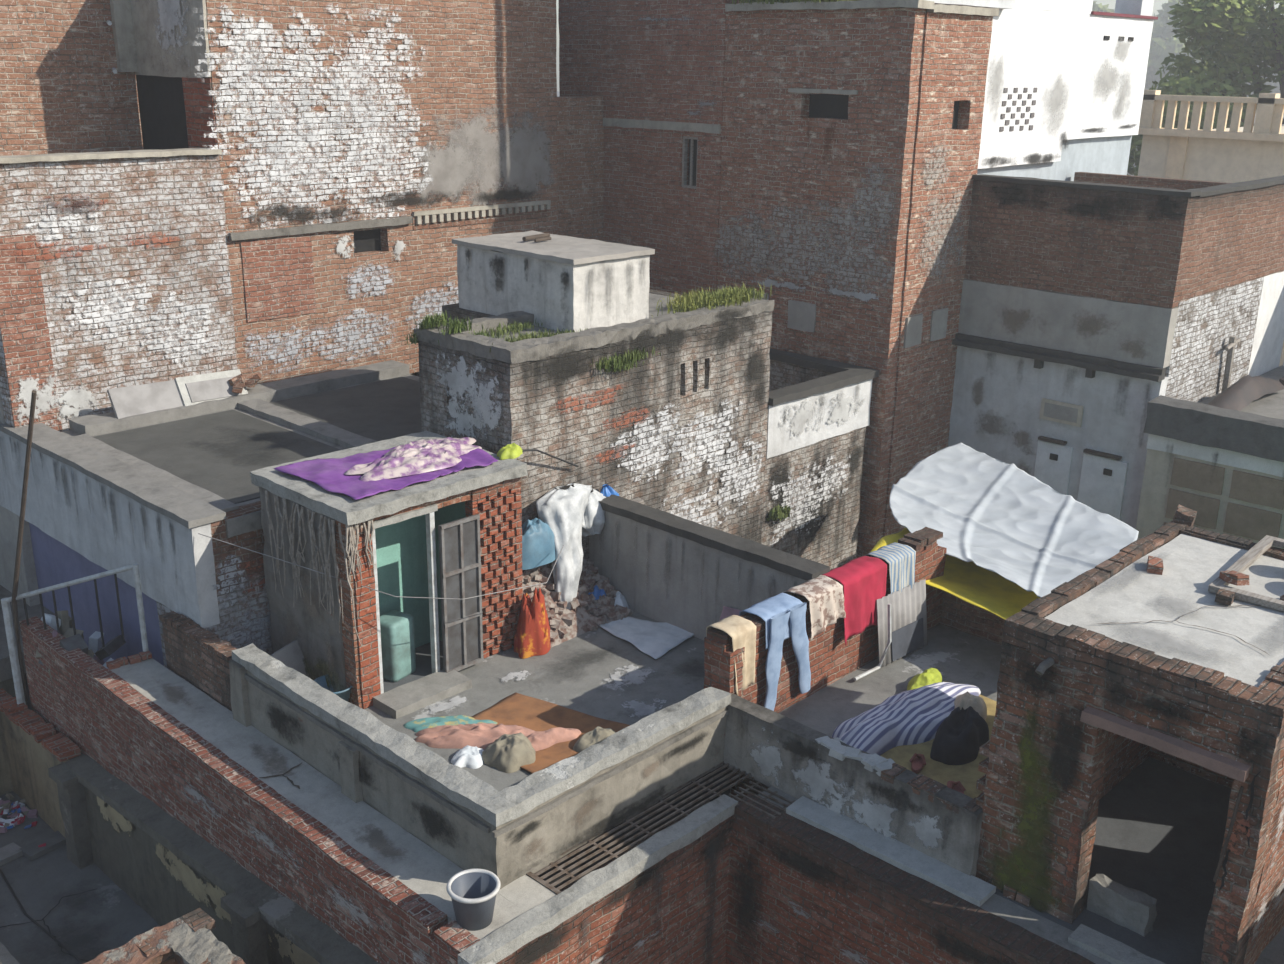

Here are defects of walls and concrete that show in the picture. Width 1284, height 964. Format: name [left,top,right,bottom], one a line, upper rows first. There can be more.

damp [986,79,1068,167]
peeling [0,192,107,266]
peeling [138,0,459,373]
damp [252,205,349,224]
damp [370,191,442,208]
peeling [57,276,227,364]
peeling [13,368,100,426]
peeling [435,354,504,439]
peeling [556,384,850,547]
damp [769,466,791,505]
crack [1098,605,1269,655]
damp [512,921,588,964]